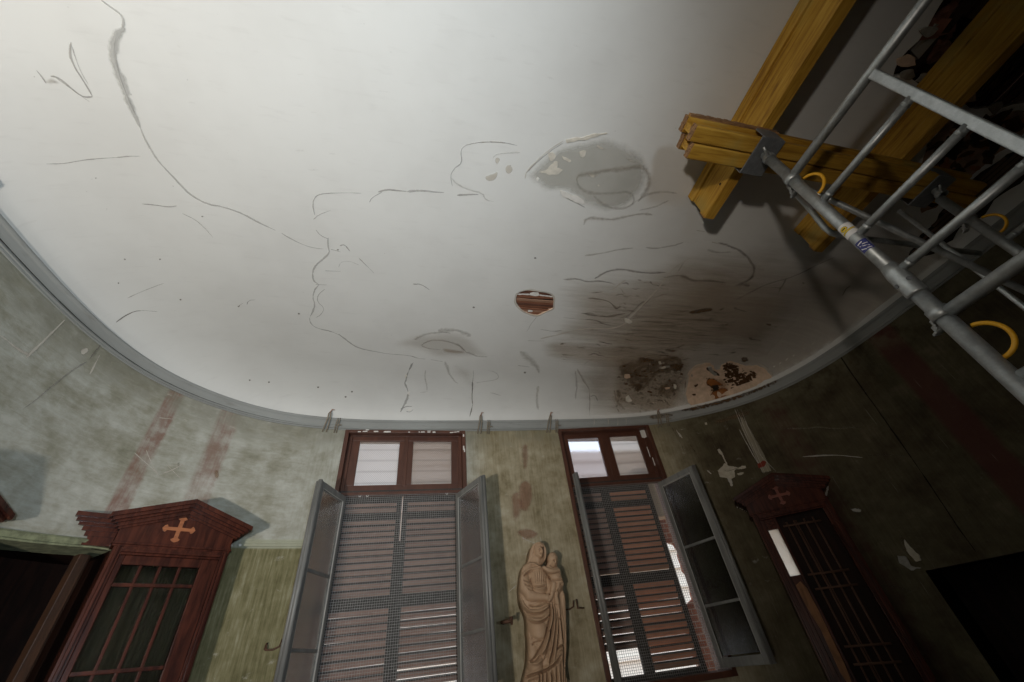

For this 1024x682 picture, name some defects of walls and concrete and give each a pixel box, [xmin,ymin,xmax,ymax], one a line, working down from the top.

crack [101,0,443,362]
crack [0,238,290,422]
flaking render [514,289,555,327]
water stain [592,333,776,425]
flaking render [684,357,773,405]
flaking render [707,449,766,486]